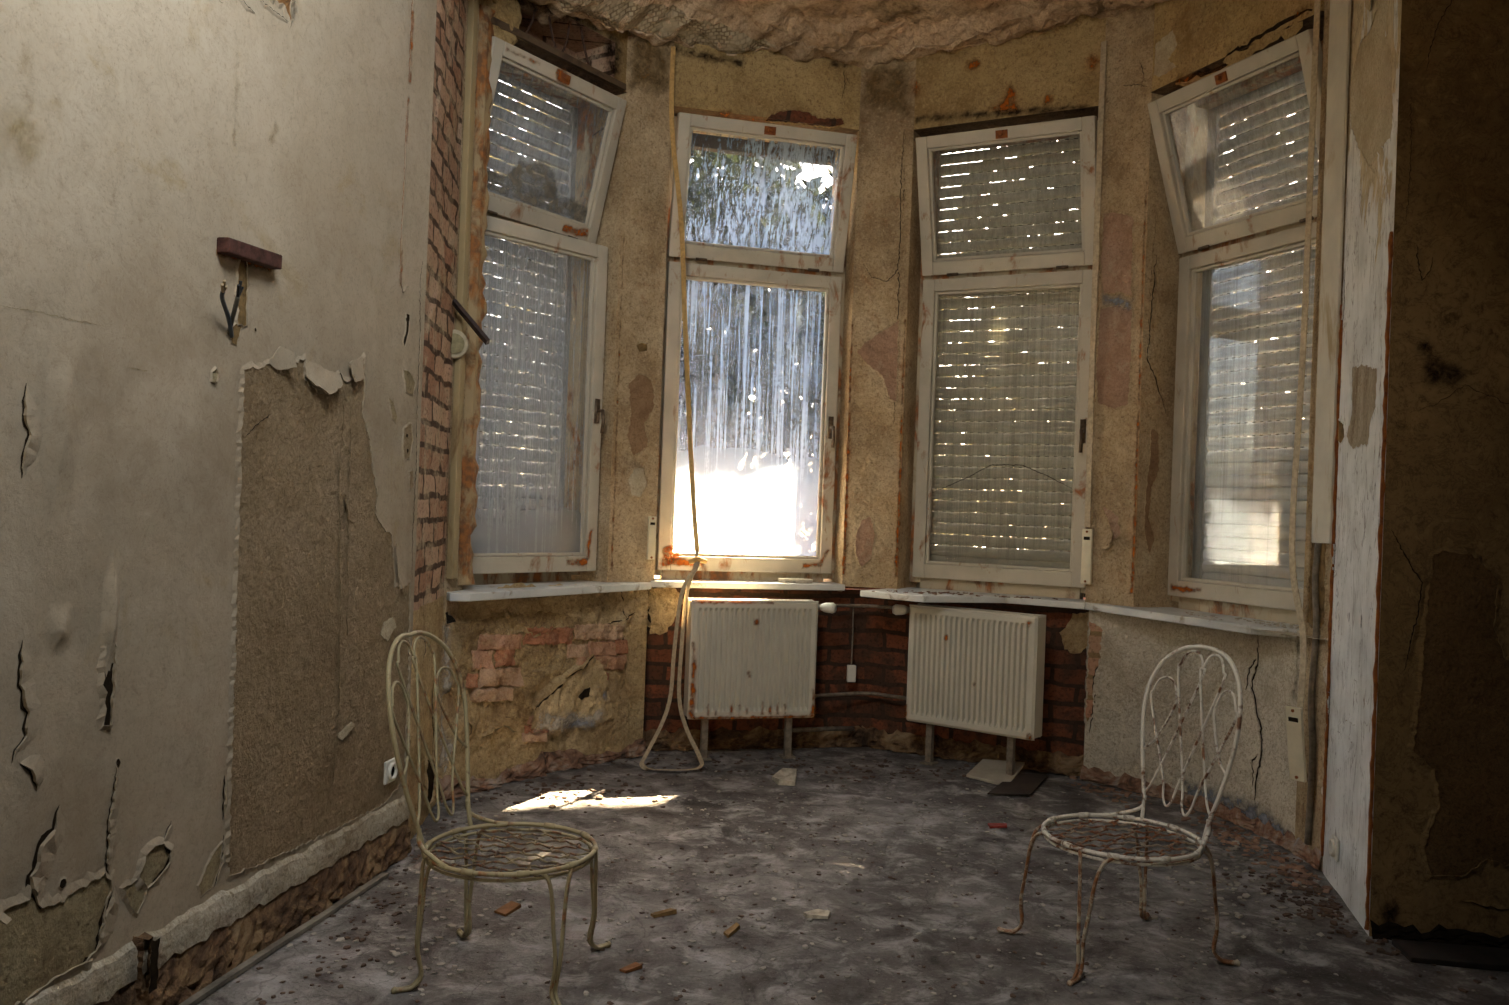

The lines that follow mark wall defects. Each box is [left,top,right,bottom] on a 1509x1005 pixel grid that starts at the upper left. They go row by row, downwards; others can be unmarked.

spalling [269,0,295,30]
spalling [483,0,615,78]
spalling [766,3,1081,59]
spalling [402,312,410,348]
peeling [196,346,416,898]
flaking render [443,582,628,751]
crack [1243,635,1263,806]
crack [1324,671,1332,756]
peeling [0,867,160,1005]